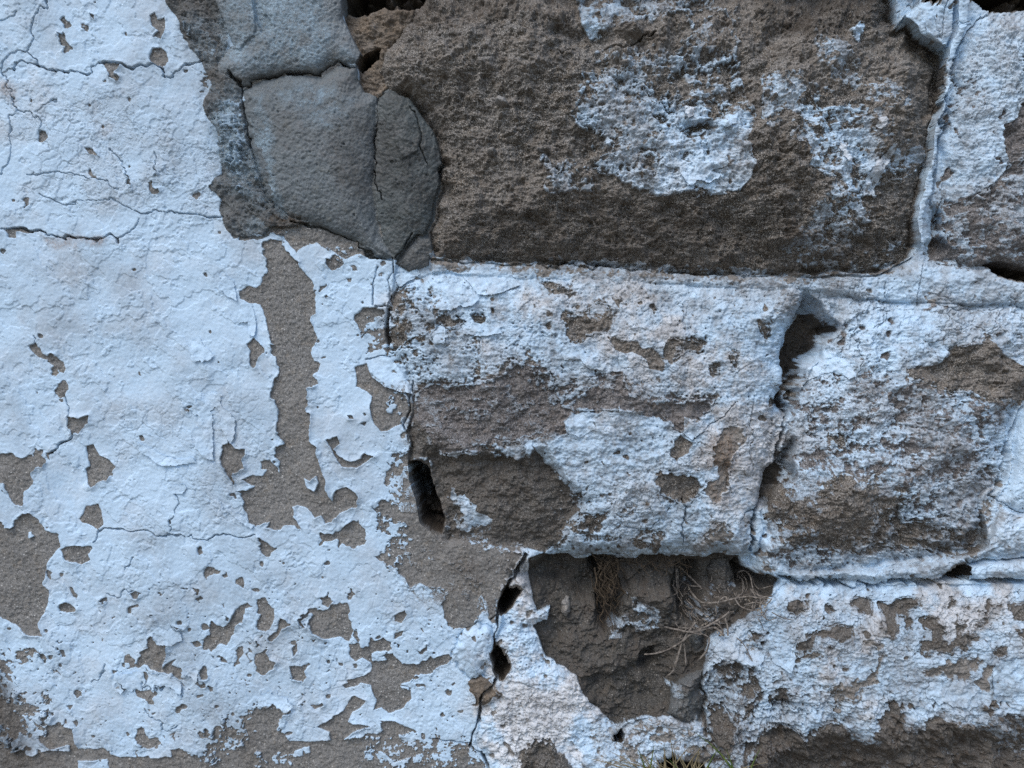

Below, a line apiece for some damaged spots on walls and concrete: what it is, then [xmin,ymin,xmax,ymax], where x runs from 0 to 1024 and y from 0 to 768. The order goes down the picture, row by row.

peeling [578,0,698,41]
crack [1,16,223,244]
crack [373,89,389,201]
crack [410,107,428,164]
peeling [575,21,926,198]
crack [403,381,414,441]
peeling [136,239,748,630]
spalling [758,471,990,557]
peeling [906,334,1024,407]
peeling [0,445,487,768]
crack [429,551,532,768]
peeling [702,595,1024,768]